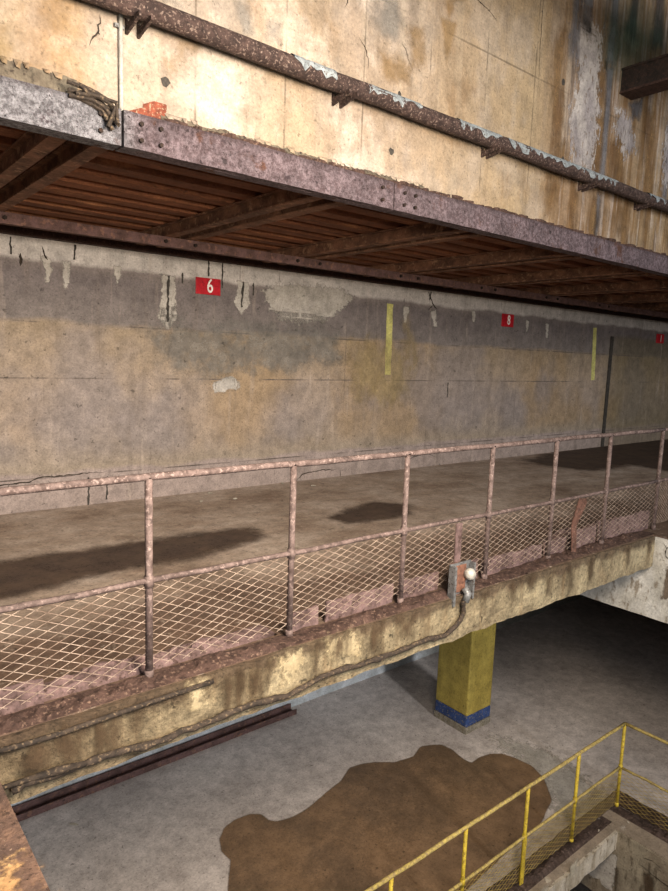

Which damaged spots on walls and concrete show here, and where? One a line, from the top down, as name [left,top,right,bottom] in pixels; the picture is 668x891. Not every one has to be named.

spalling [0,55,77,94]
rust [551,29,567,159]
rust [591,55,624,183]
water stain [568,0,665,175]
spalling [213,376,240,392]
rust [0,848,22,891]
water stain [220,734,609,891]